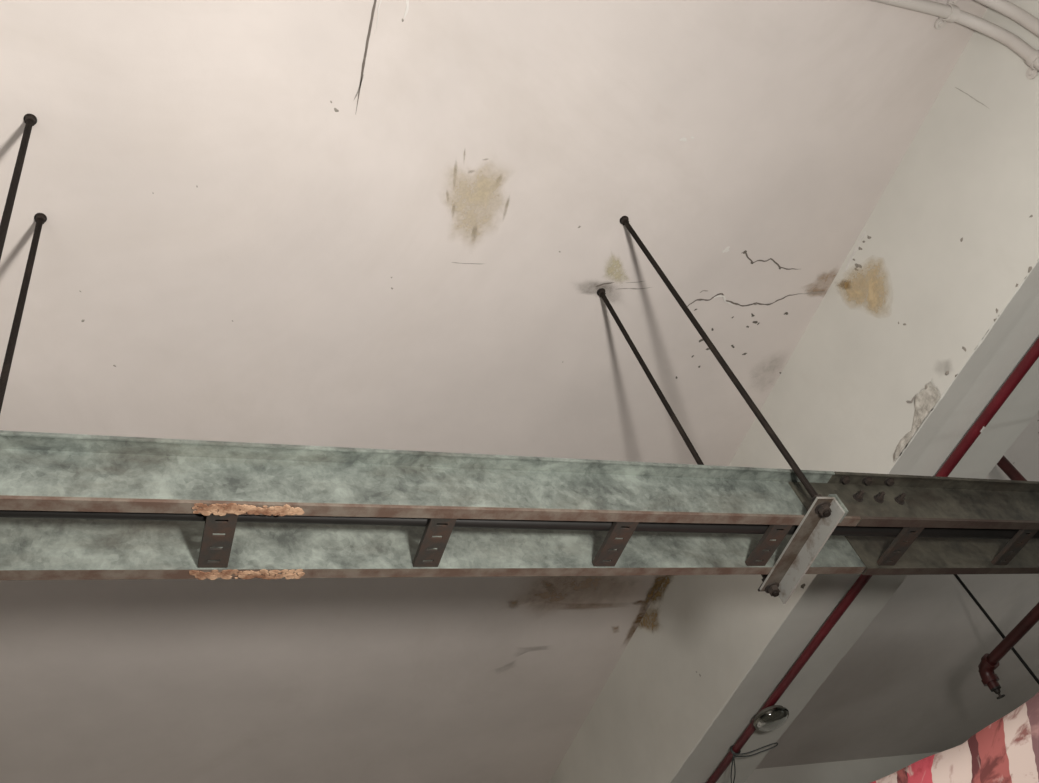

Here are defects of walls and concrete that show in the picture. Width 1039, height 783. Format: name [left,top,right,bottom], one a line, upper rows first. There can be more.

crack [354,0,382,115]
crack [687,247,825,307]
spalling [893,382,940,461]